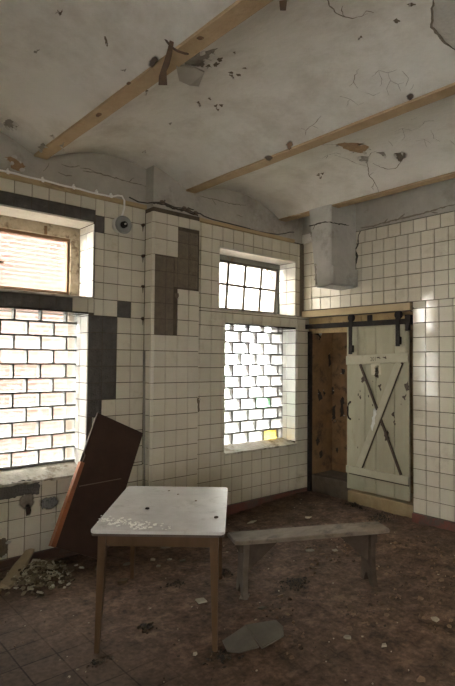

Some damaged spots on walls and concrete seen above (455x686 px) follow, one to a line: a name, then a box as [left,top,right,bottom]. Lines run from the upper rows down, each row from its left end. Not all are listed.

crack [327,0,374,19]
peeling [176,48,223,87]
spalling [336,142,406,163]
crack [309,221,361,264]